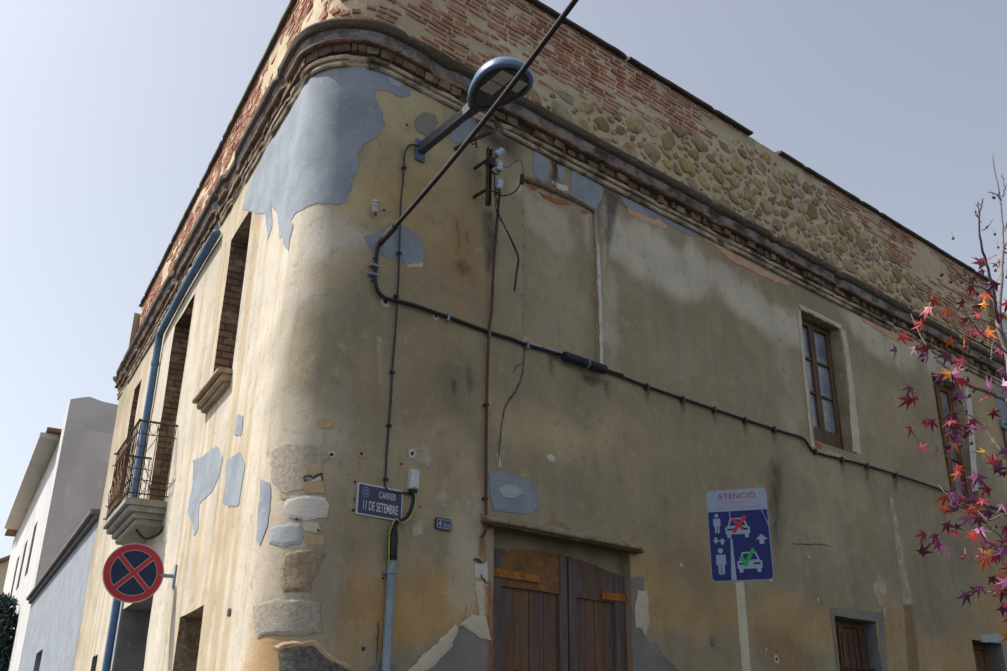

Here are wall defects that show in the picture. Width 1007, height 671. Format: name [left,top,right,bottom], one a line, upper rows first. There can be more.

spalling [252,444,352,671]
peeling [367,614,493,671]
peeling [630,576,679,671]